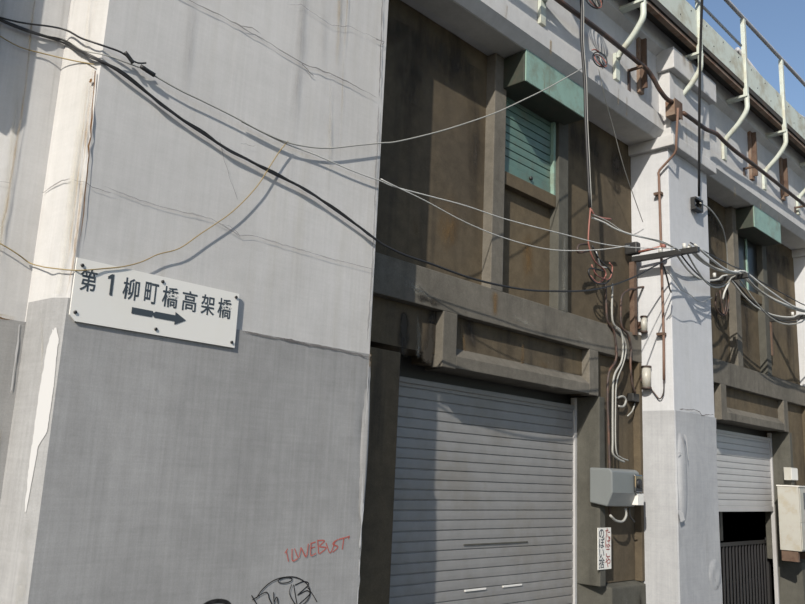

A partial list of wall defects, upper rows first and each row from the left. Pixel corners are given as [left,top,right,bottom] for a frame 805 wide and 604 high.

rust [70,71,96,272]
peeling [25,327,59,512]